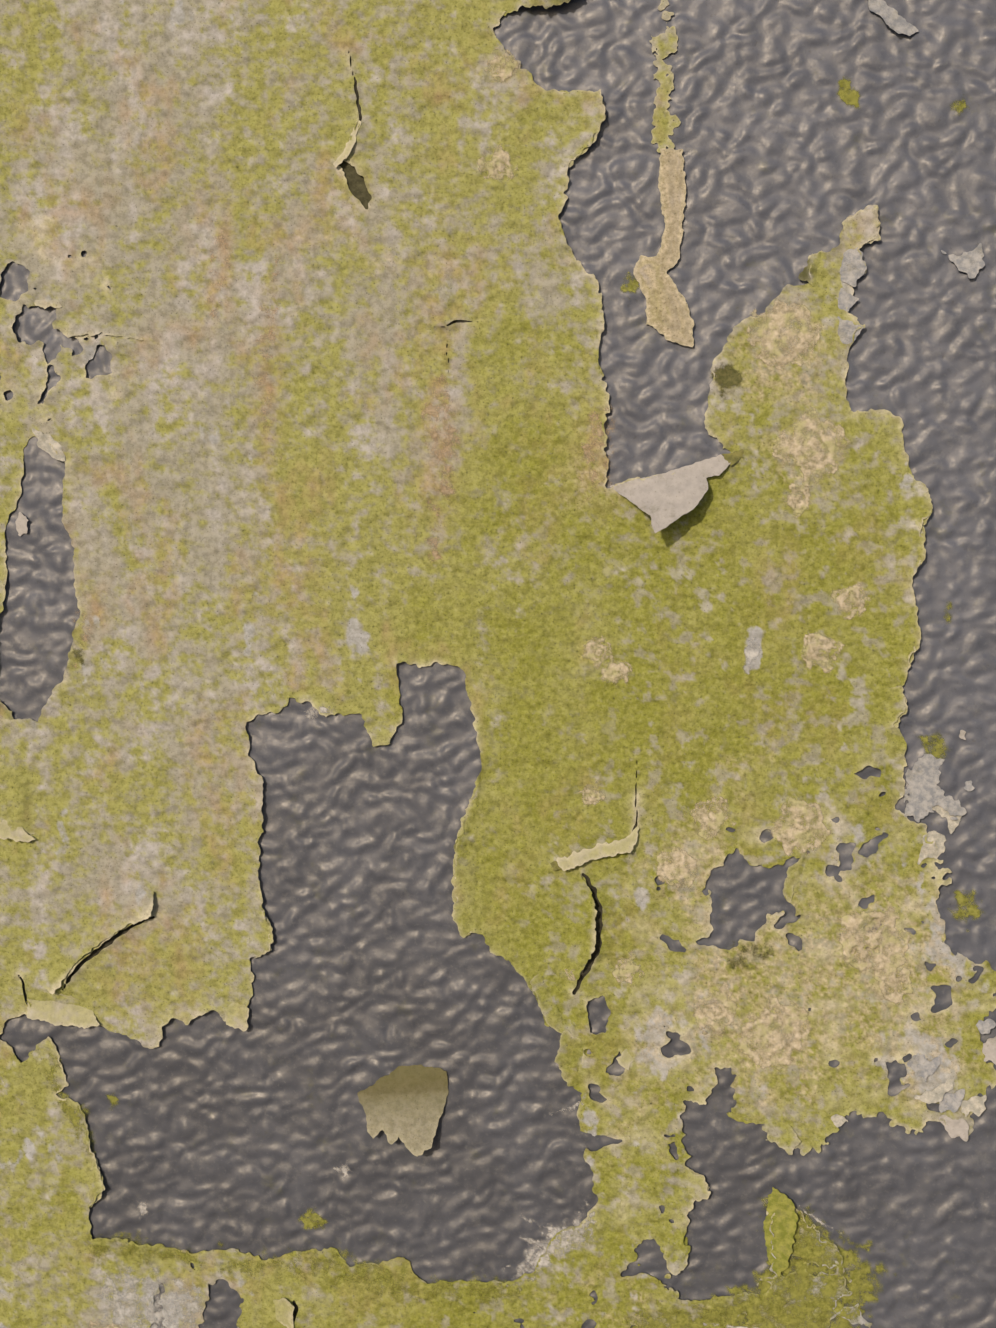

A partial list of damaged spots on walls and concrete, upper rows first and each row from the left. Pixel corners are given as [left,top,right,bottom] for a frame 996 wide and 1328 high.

crack [333,52,372,209]
peeling [560,89,606,168]
peeling [633,0,694,347]
peeling [0,261,143,404]
peeling [837,207,881,344]
peeling [610,449,744,533]
peeling [0,429,80,722]
crack [550,761,639,995]
peeling [705,848,810,948]
peeling [904,754,975,865]
peeling [0,662,634,1284]
peeling [199,1279,244,1328]